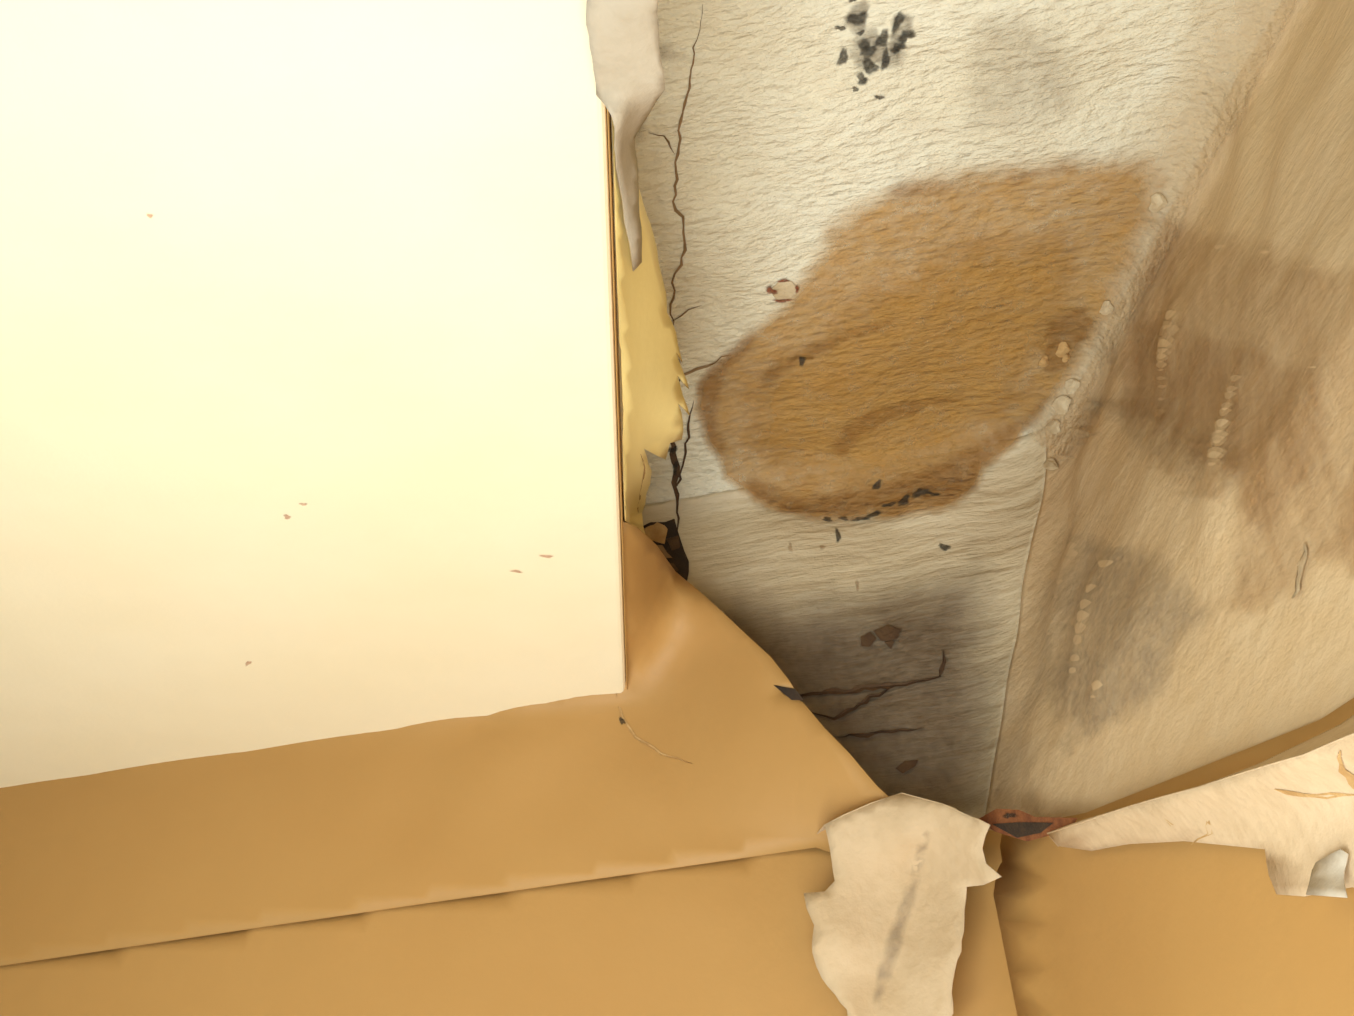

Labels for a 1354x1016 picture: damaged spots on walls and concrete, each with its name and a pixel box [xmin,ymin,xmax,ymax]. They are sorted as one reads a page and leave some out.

crack [650,5,703,325]
water stain [700,0,1293,541]
crack [668,355,731,530]
spalling [643,519,689,581]
crack [801,652,946,738]
peeling [993,715,1354,898]